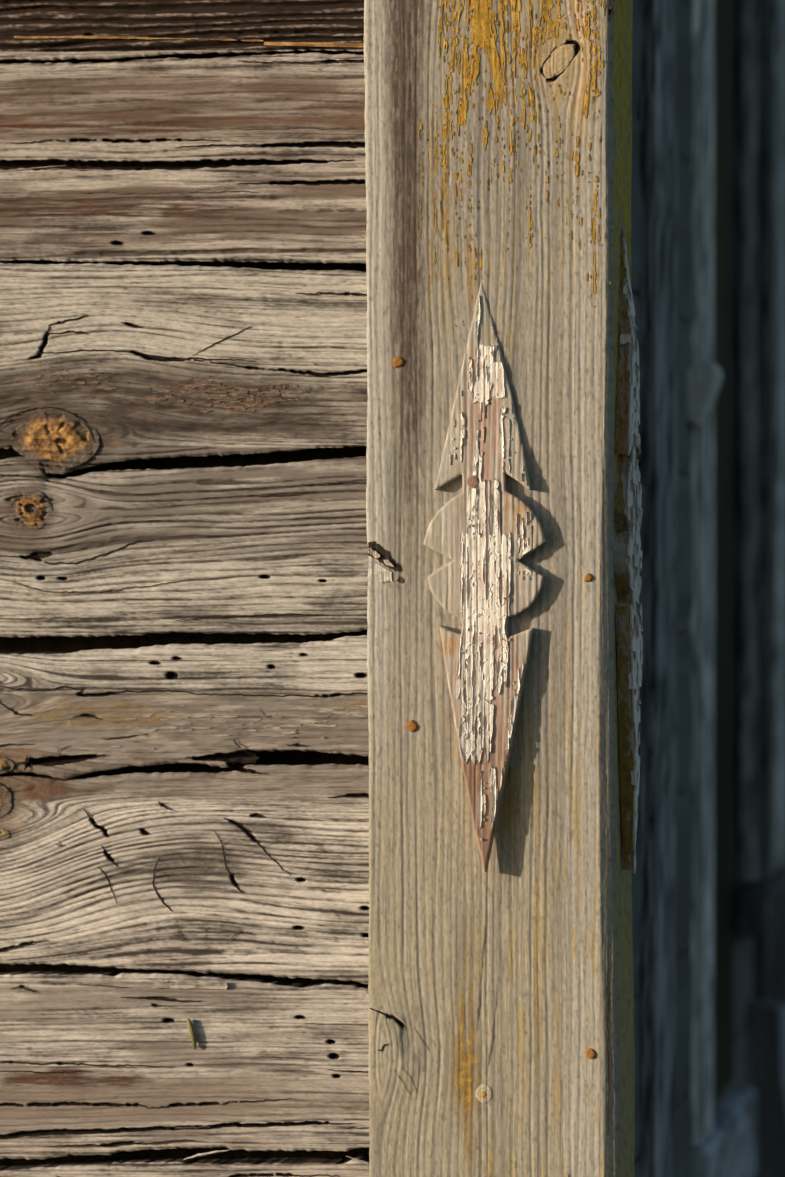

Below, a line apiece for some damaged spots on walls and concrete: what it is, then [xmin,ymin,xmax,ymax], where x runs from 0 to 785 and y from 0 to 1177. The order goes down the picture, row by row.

crack [26,315,367,377]
peeling [416,0,643,873]
spalling [368,541,403,583]
crack [83,808,118,903]
crack [140,828,184,940]
crack [214,813,291,893]